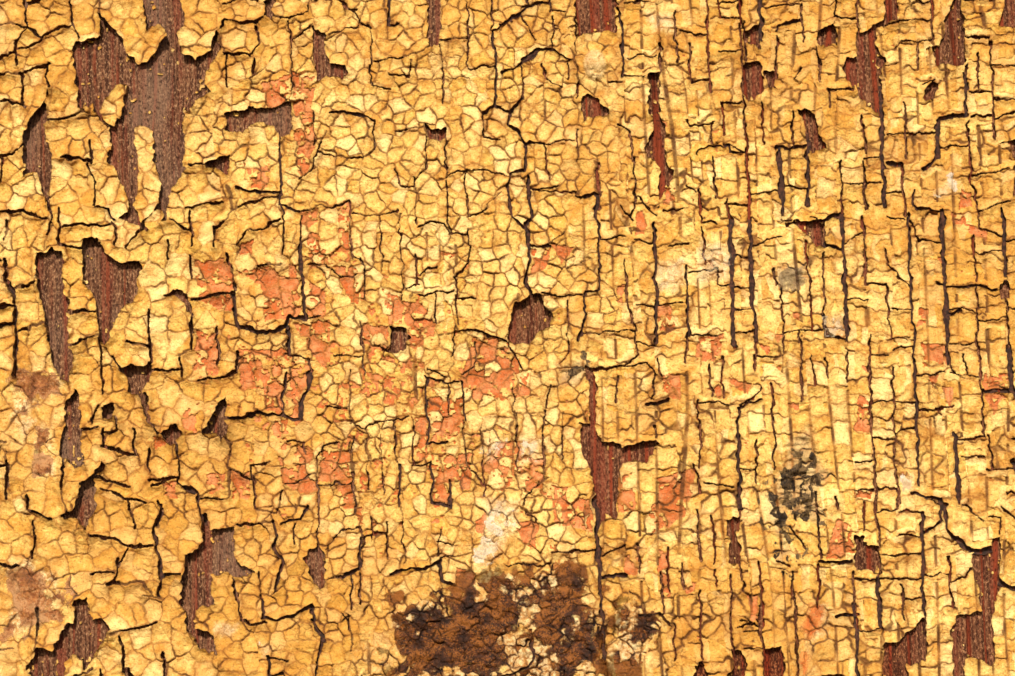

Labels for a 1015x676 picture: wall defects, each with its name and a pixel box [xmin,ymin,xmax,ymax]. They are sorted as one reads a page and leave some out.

peeling [0,0,365,676]
crack [189,137,313,421]
peeling [415,243,574,508]
crack [483,0,565,295]
peeling [483,350,696,538]
crack [727,219,758,347]
crack [776,134,850,341]
crack [877,74,1007,616]
peeling [911,0,1015,111]
crack [261,507,326,676]
peeling [682,632,789,676]
peeling [806,510,1015,676]